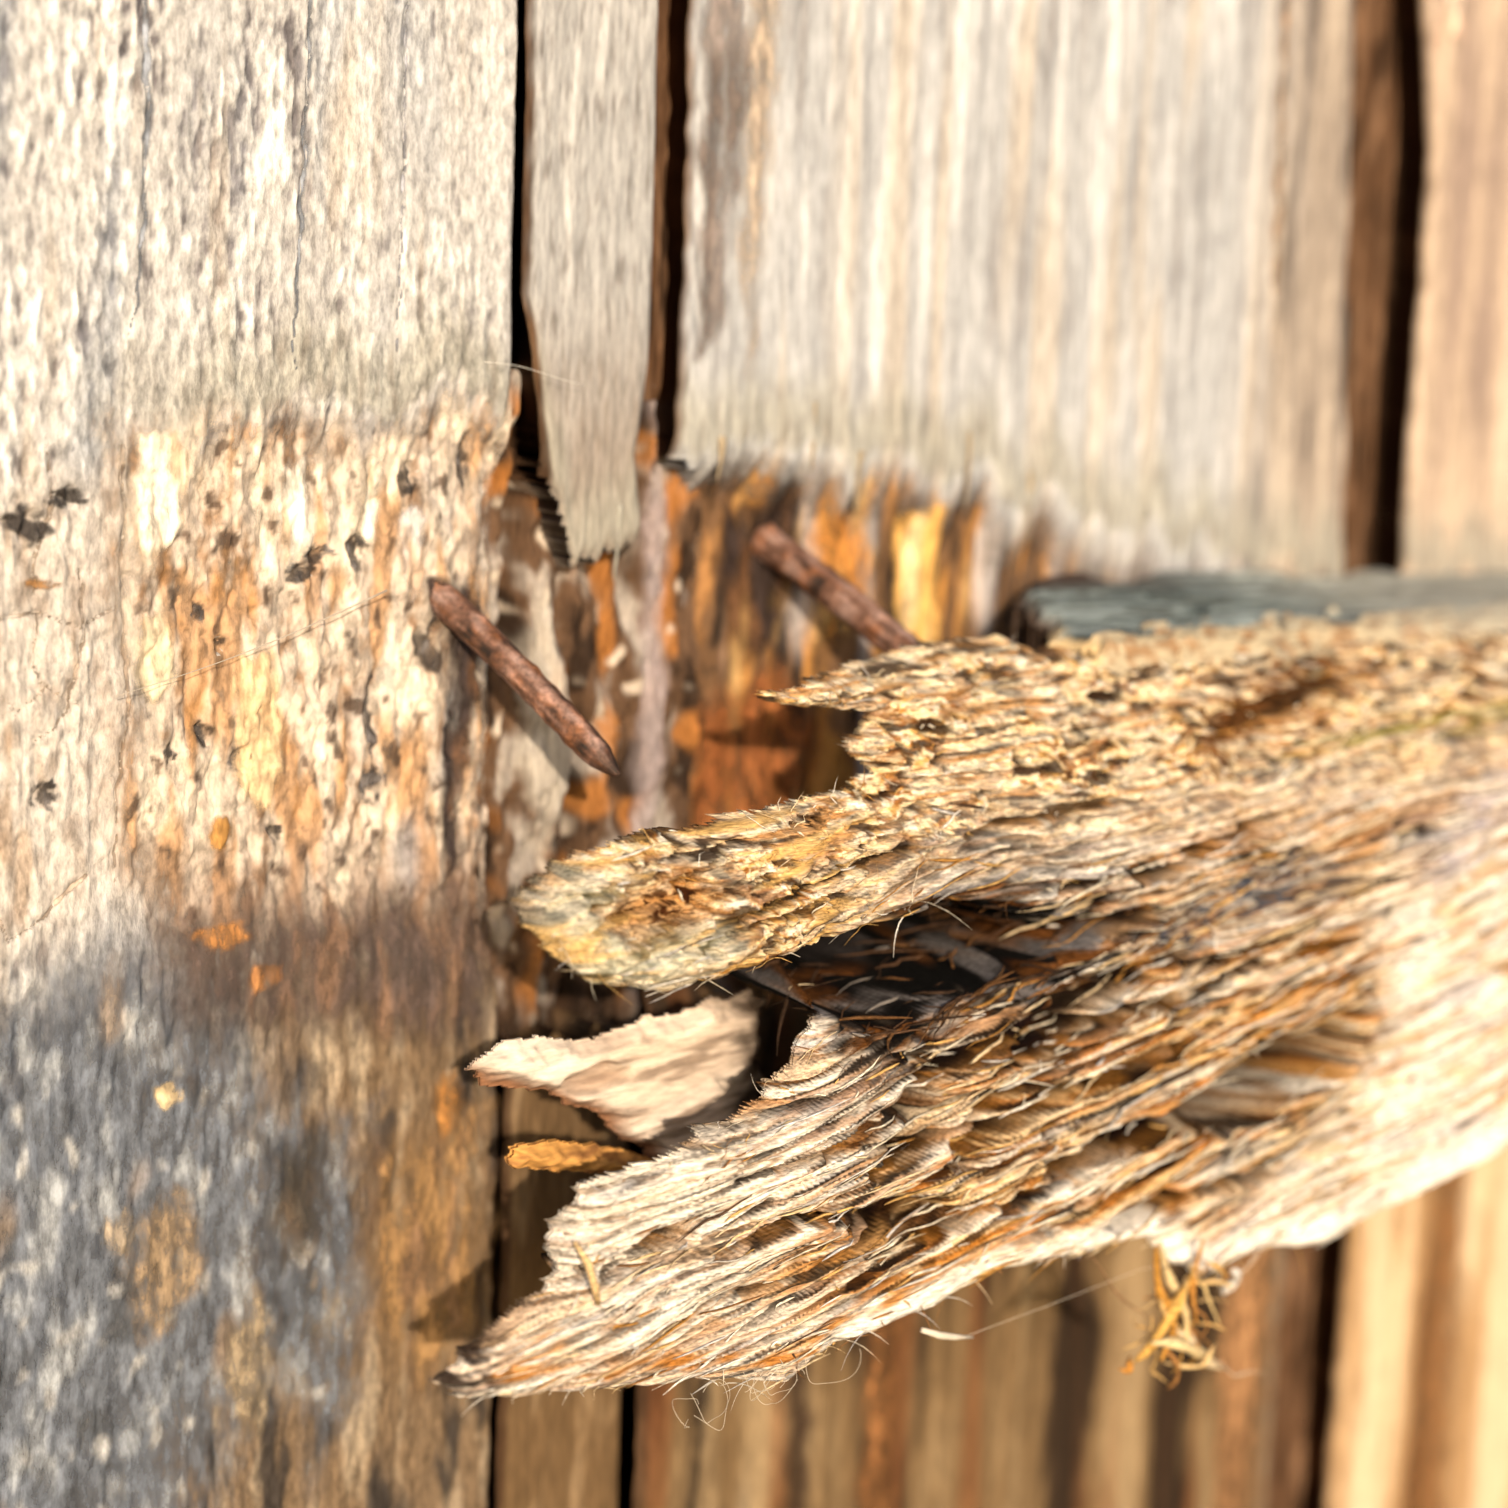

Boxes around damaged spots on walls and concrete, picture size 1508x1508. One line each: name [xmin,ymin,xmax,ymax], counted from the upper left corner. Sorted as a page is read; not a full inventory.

crack [130,0,153,327]
crack [291,0,312,369]
corrosion [720,495,873,654]
corrosion [427,576,481,872]
corrosion [691,672,819,825]
leakage [183,903,485,1036]
leakage [0,977,366,1508]
leakage [375,1108,478,1376]